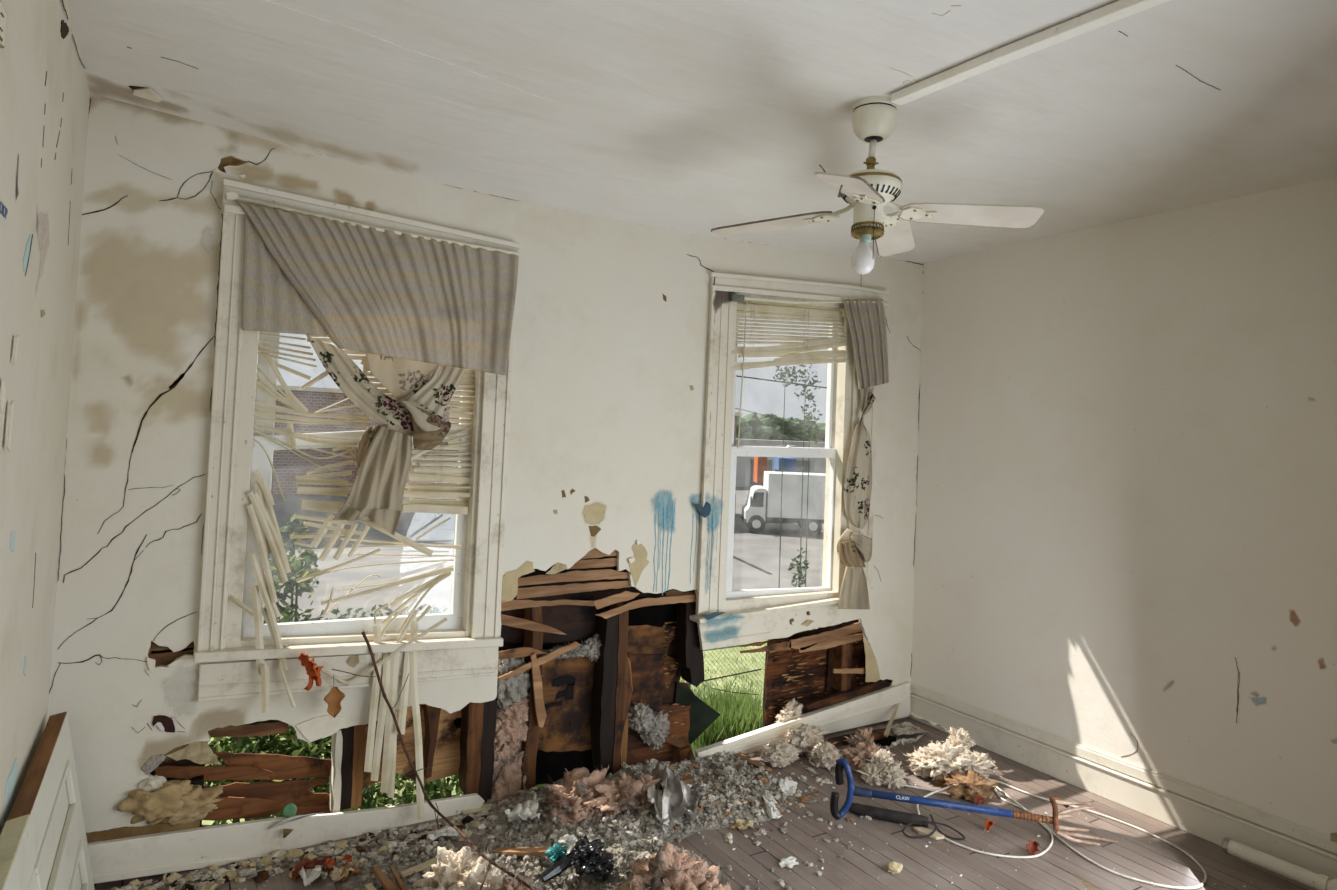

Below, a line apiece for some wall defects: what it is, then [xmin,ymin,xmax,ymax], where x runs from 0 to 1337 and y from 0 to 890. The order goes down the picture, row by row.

peeling [23,234,33,276]
crack [32,0,223,694]
peeling [0,335,19,451]
flaking render [502,561,567,601]
flaking render [628,540,650,587]
flaking render [145,641,194,675]
flaking render [862,632,880,682]
flaking render [296,715,348,742]
flaking render [141,741,221,775]
peeling [2,758,17,830]